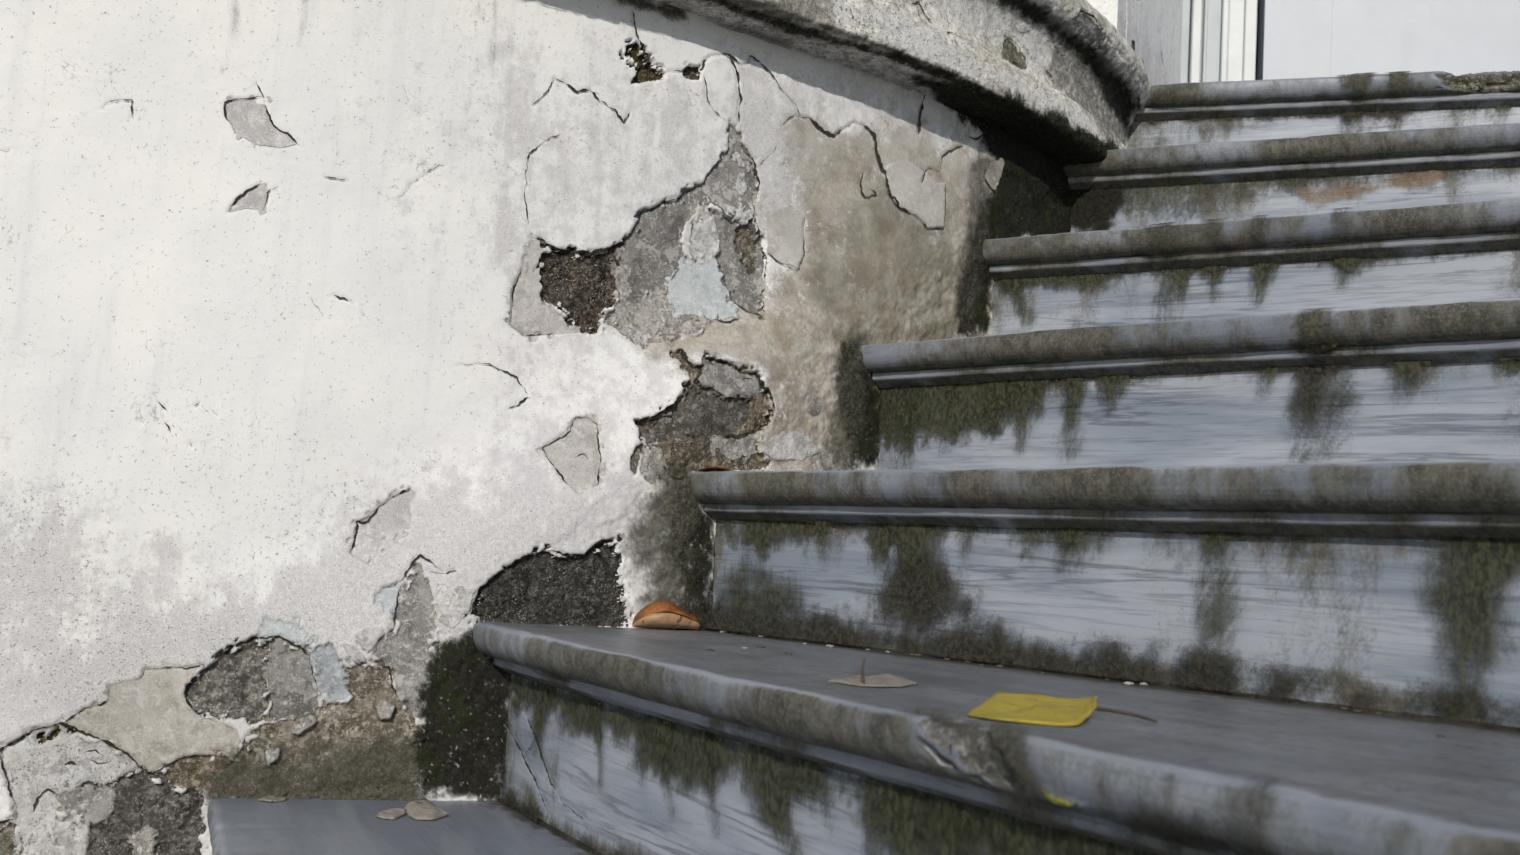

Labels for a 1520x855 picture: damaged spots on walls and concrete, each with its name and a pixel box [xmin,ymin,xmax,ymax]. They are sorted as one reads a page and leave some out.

spalling [619,9,700,84]
peeling [223,83,300,152]
peeling [229,183,278,214]
peeling [883,161,946,230]
leakage [1148,222,1186,257]
spalling [505,125,805,495]
leakage [1294,308,1339,354]
peeling [347,486,414,566]
spalling [0,535,632,855]
leakage [203,626,511,805]
leakage [1123,777,1279,855]